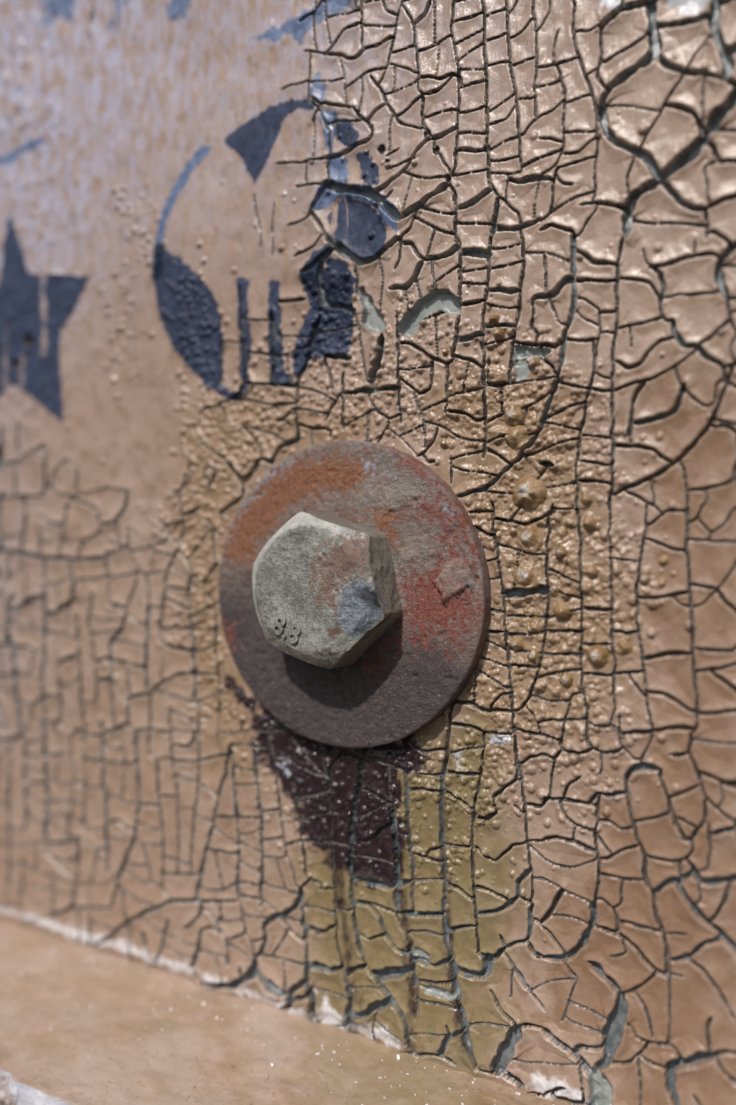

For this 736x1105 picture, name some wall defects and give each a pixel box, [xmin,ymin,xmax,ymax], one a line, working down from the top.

crack [282,0,447,156]
crack [438,0,482,114]
crack [296,129,458,221]
crack [200,352,352,516]
peeling [358,288,386,333]
crack [219,301,543,443]
peeling [399,289,462,338]
crack [0,422,184,648]
crack [541,504,555,547]
crack [56,589,192,783]
crack [283,779,429,961]
crack [639,1017,736,1105]